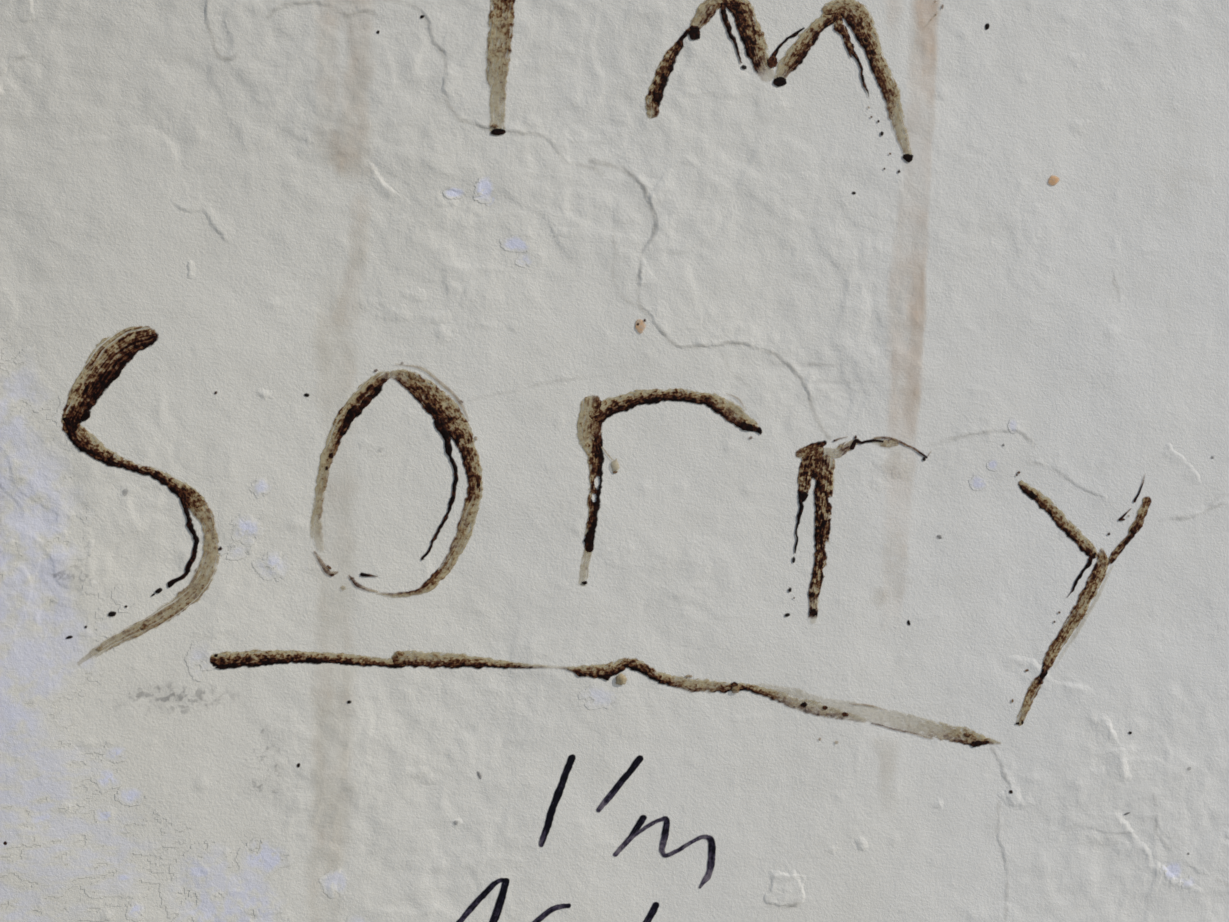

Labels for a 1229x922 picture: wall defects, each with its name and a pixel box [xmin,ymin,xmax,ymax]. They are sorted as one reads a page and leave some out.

crack [204,0,235,55]
crack [264,0,833,419]